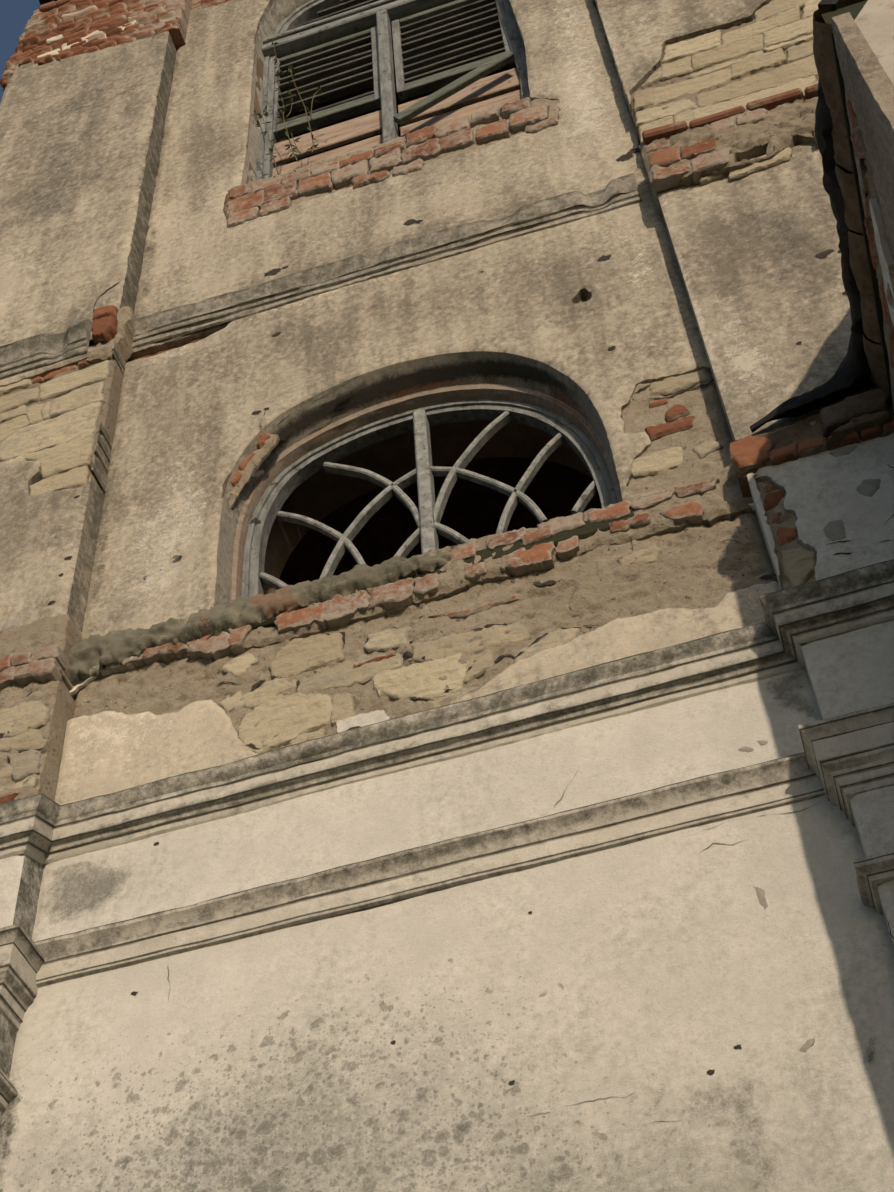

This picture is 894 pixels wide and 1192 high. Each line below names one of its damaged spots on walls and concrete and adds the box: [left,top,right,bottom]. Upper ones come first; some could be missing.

spalling [0,0,230,92]
spalling [616,0,821,192]
spalling [223,97,560,228]
spalling [847,100,894,368]
flaking render [91,305,118,345]
spalling [0,335,210,498]
spalling [621,369,733,495]
peeling [823,519,846,542]
peeling [856,479,881,497]
spalling [0,480,817,804]